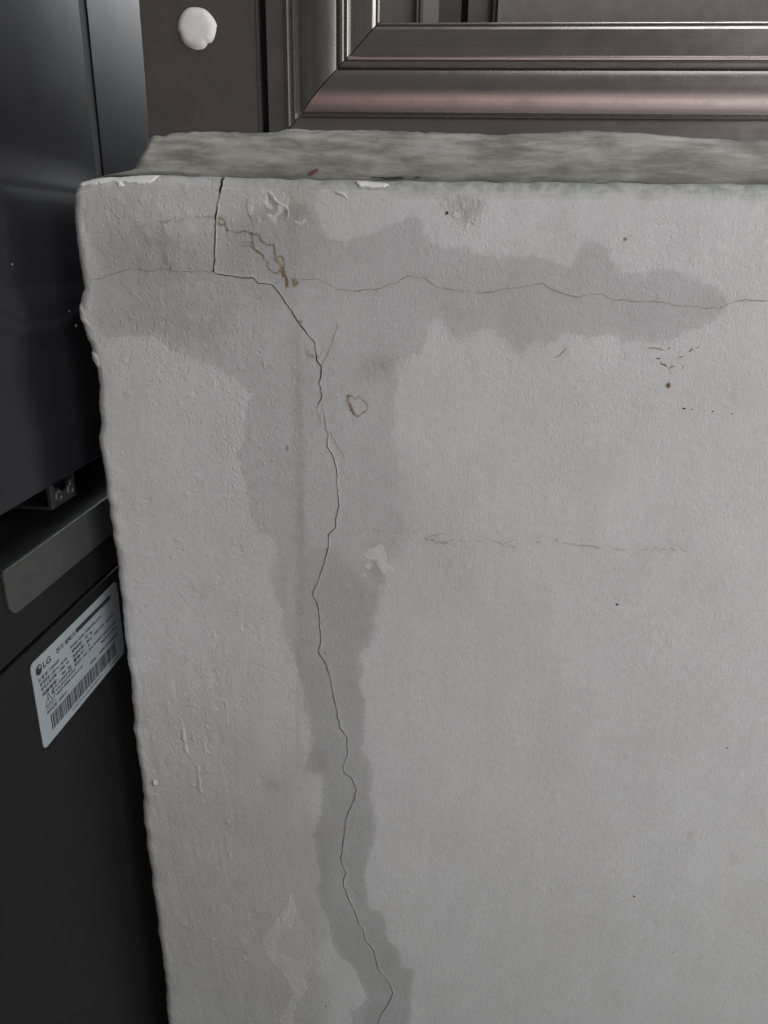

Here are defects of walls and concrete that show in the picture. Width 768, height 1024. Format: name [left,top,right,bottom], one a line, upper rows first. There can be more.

crack [93,176,764,1023]